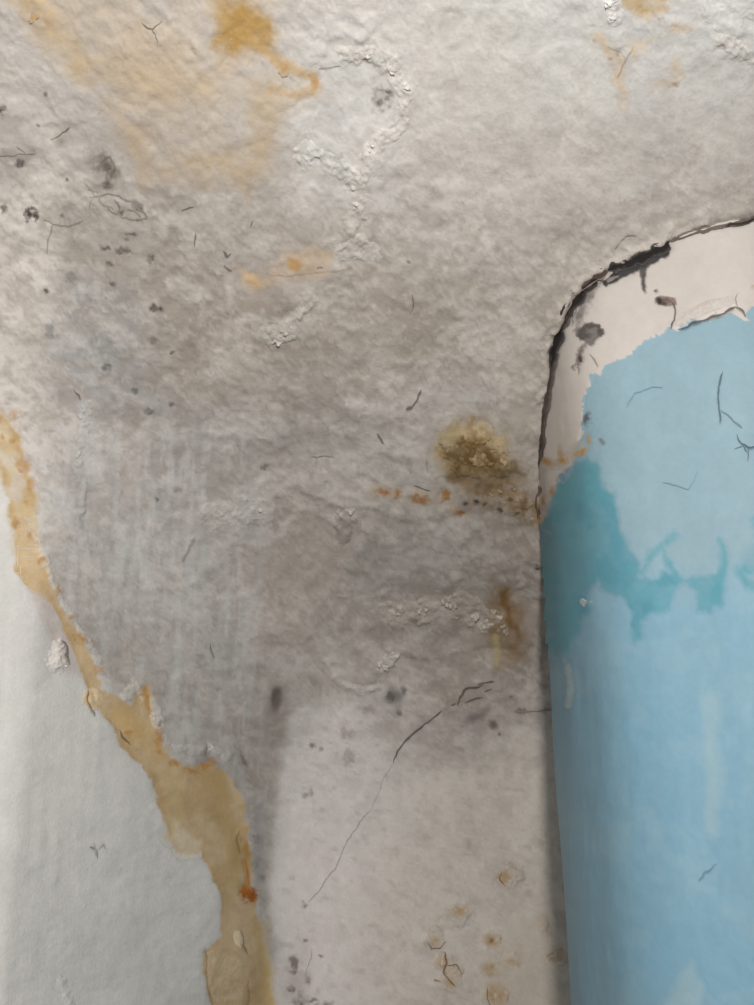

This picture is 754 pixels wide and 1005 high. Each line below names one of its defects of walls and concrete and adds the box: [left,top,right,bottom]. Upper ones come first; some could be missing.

water stain [619,0,680,25]
water stain [0,0,337,269]
water stain [224,241,344,297]
spalling [571,243,678,375]
crack [535,216,754,519]
corrosion [360,478,475,522]
peeling [540,454,754,710]
spalling [12,517,281,1005]
water stain [257,675,294,727]
mould [308,684,408,770]
crack [308,680,495,902]
mould [278,933,335,1005]